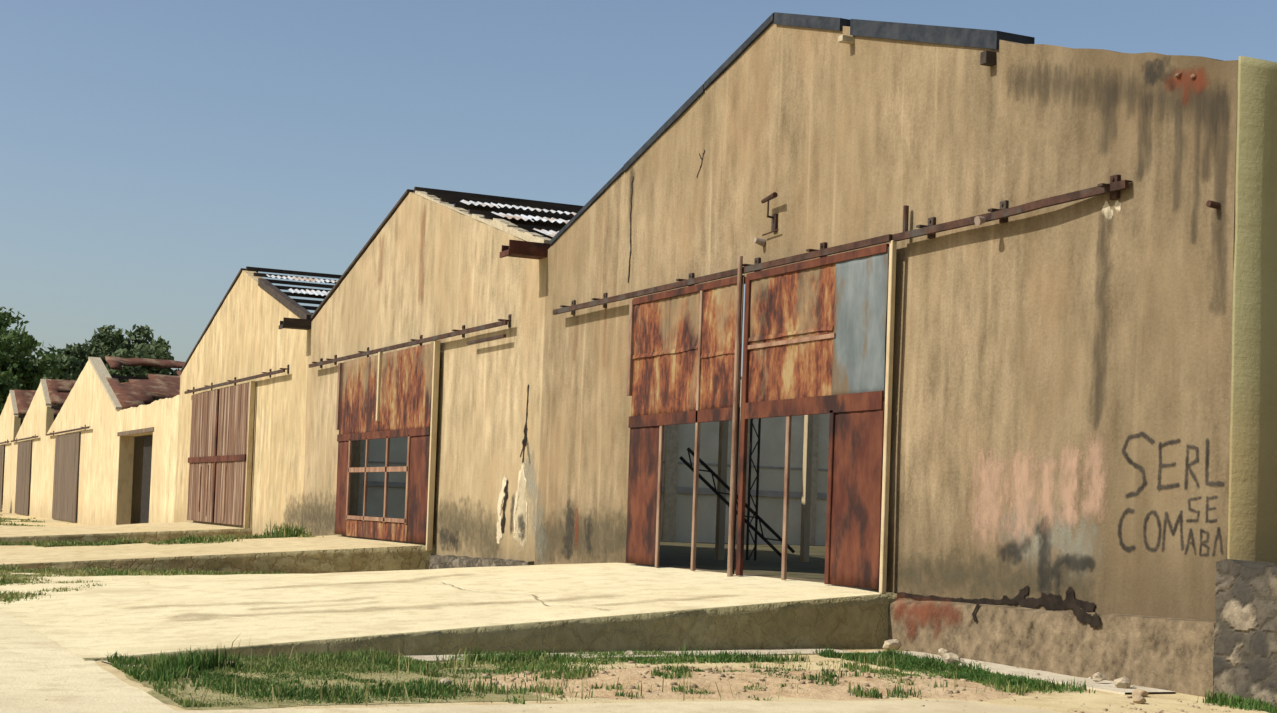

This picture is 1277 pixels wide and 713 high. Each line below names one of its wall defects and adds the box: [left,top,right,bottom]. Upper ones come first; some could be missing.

crack [520,384,530,463]
peeling [496,463,543,554]
leakage [543,502,626,557]